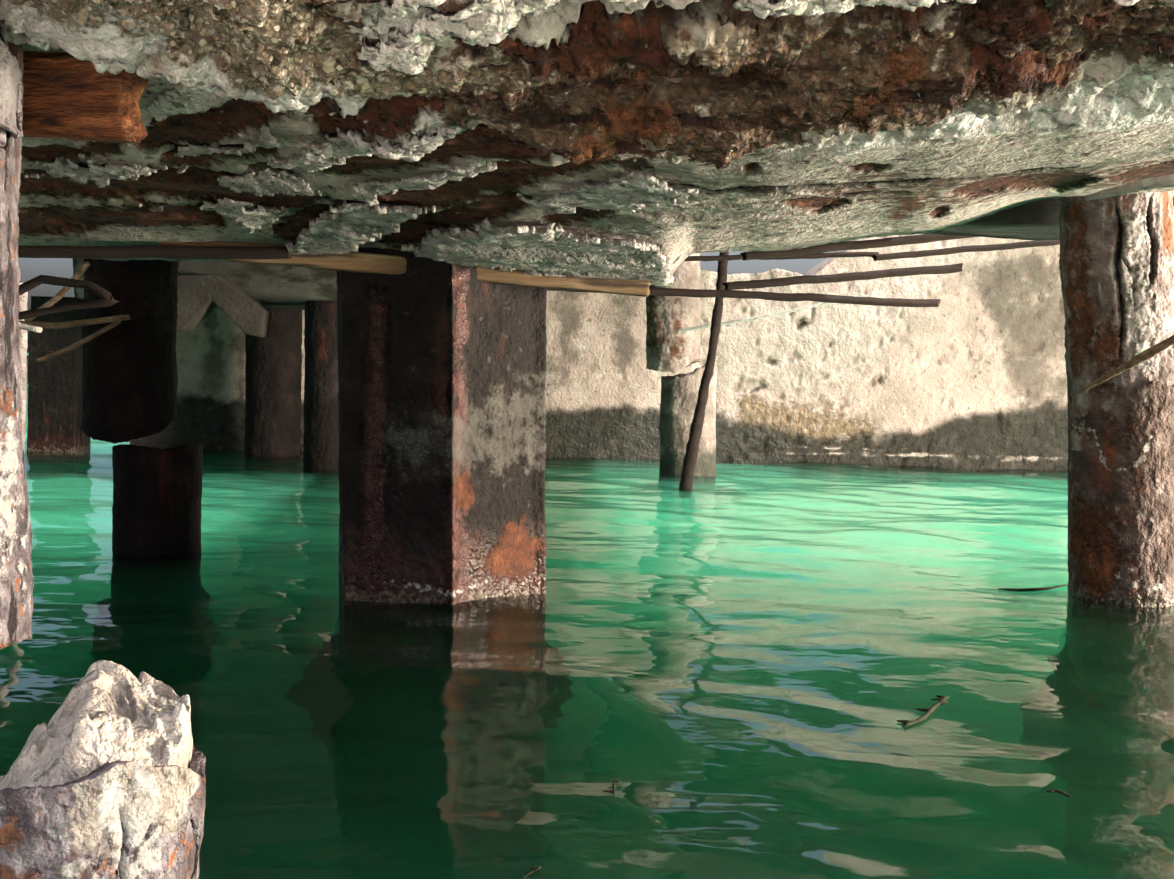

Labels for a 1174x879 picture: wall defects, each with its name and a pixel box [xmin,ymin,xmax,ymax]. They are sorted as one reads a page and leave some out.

rust [311,0,392,25]
rust [437,0,469,14]
peeling [356,0,638,75]
peeling [714,0,977,33]
rust [459,0,710,165]
crack [0,130,10,190]
peeling [0,40,699,288]
rust [849,162,890,173]
crack [1115,203,1155,361]
rust [442,271,546,609]
rust [1070,495,1122,598]
leakage [391,580,487,597]